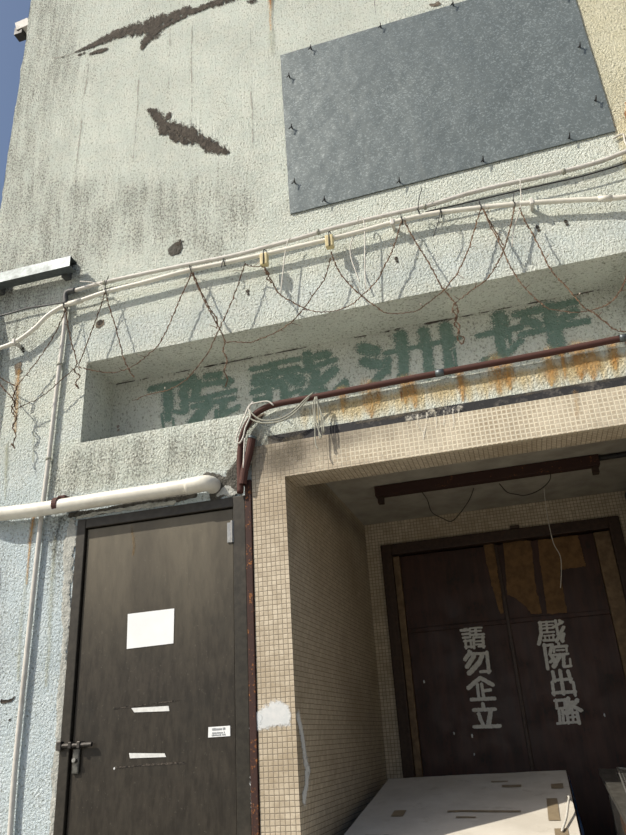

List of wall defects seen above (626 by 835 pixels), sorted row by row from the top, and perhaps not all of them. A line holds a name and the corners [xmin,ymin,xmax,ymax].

rust [545,348,598,386]